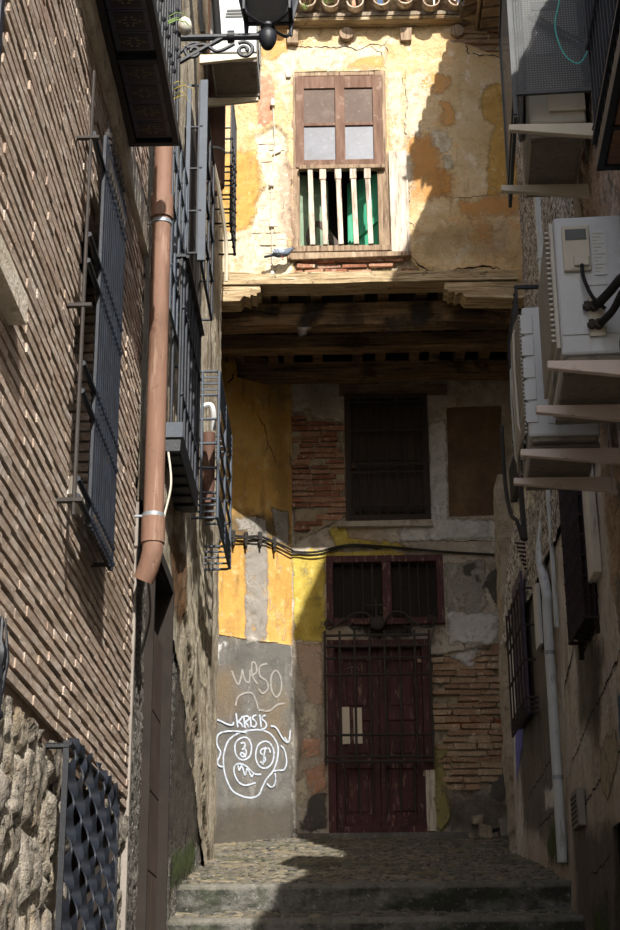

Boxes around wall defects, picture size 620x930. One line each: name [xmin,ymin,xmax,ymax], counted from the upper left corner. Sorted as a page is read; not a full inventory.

crack [296,38,390,56]
flaking render [222,30,455,274]
crack [402,70,410,160]
peeling [480,83,518,195]
flaking render [236,409,506,833]